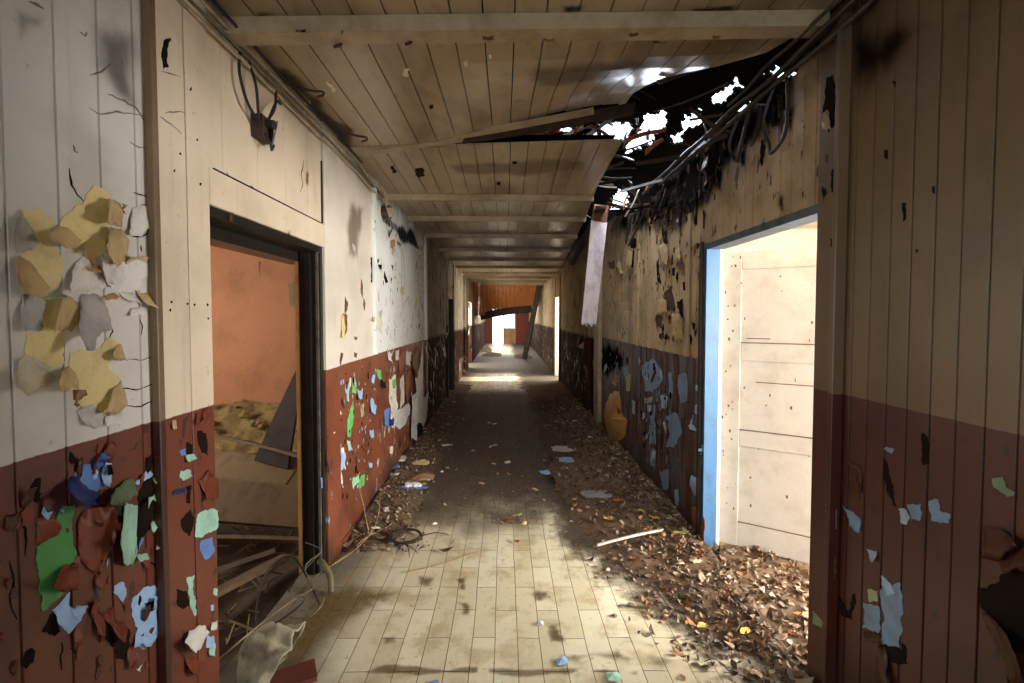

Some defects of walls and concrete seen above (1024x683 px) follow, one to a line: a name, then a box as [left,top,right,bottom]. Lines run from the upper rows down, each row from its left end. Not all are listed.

crack [69,145,84,202]
crack [90,64,184,148]
spalling [602,137,725,345]
water stain [617,80,793,235]
peeling [5,442,160,680]
crack [123,384,152,407]
peeling [173,406,219,560]
peeling [177,575,218,675]
spalling [333,239,446,499]
peeling [623,358,705,541]
peeling [838,575,907,683]
peeling [883,447,951,525]